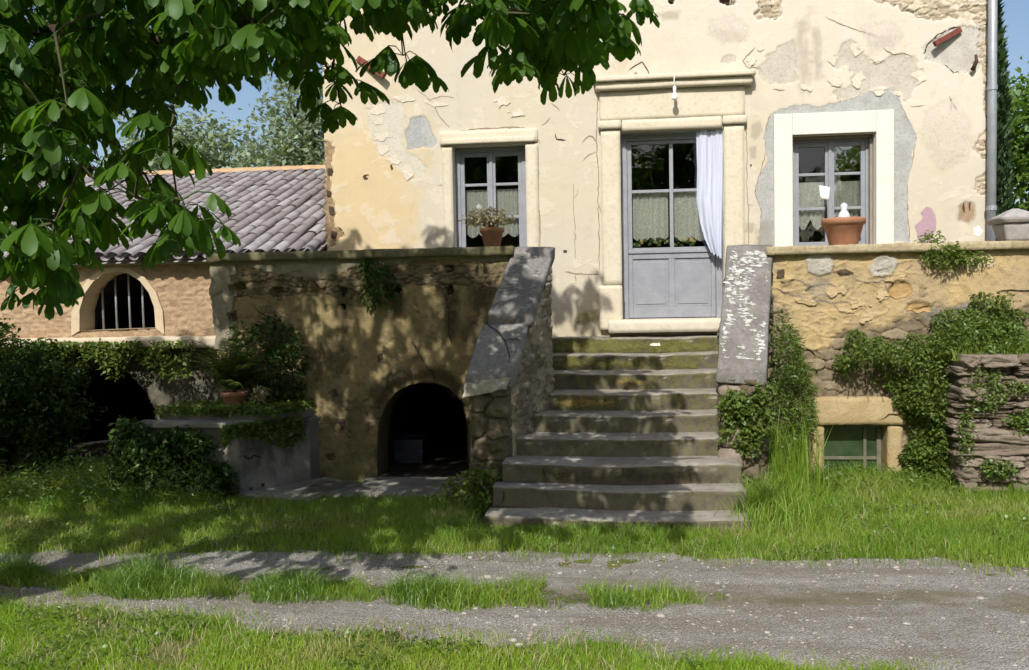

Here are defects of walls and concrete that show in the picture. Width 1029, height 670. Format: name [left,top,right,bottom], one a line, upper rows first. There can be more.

spalling [754,0,782,21]
flaking render [721,40,798,84]
flaking render [830,0,988,158]
flaking render [366,93,448,180]
spalling [323,141,344,247]
spalling [974,172,987,195]
flaking render [824,266,931,323]
crack [487,324,520,360]